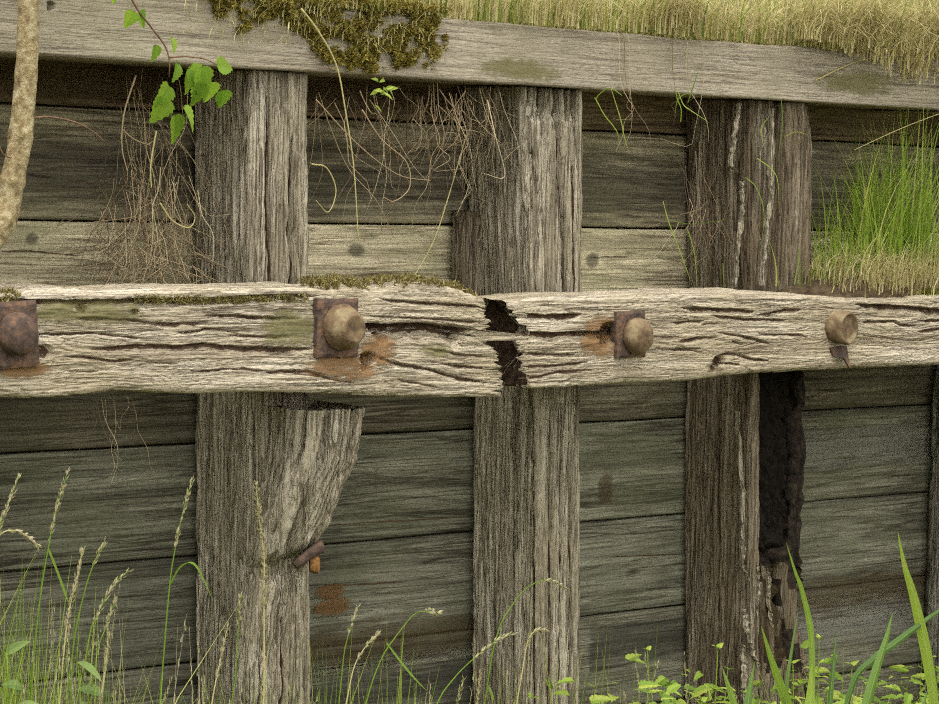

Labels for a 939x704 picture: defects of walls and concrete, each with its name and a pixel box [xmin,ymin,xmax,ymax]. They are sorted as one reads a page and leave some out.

crack [4,97,353,383]
rust [1,364,50,378]
rust [309,334,395,381]
crack [365,298,485,388]
crack [512,138,625,468]
rust [582,316,614,356]
crack [654,255,807,365]
crack [855,304,939,341]
rust [309,555,320,574]
crack [513,487,570,704]